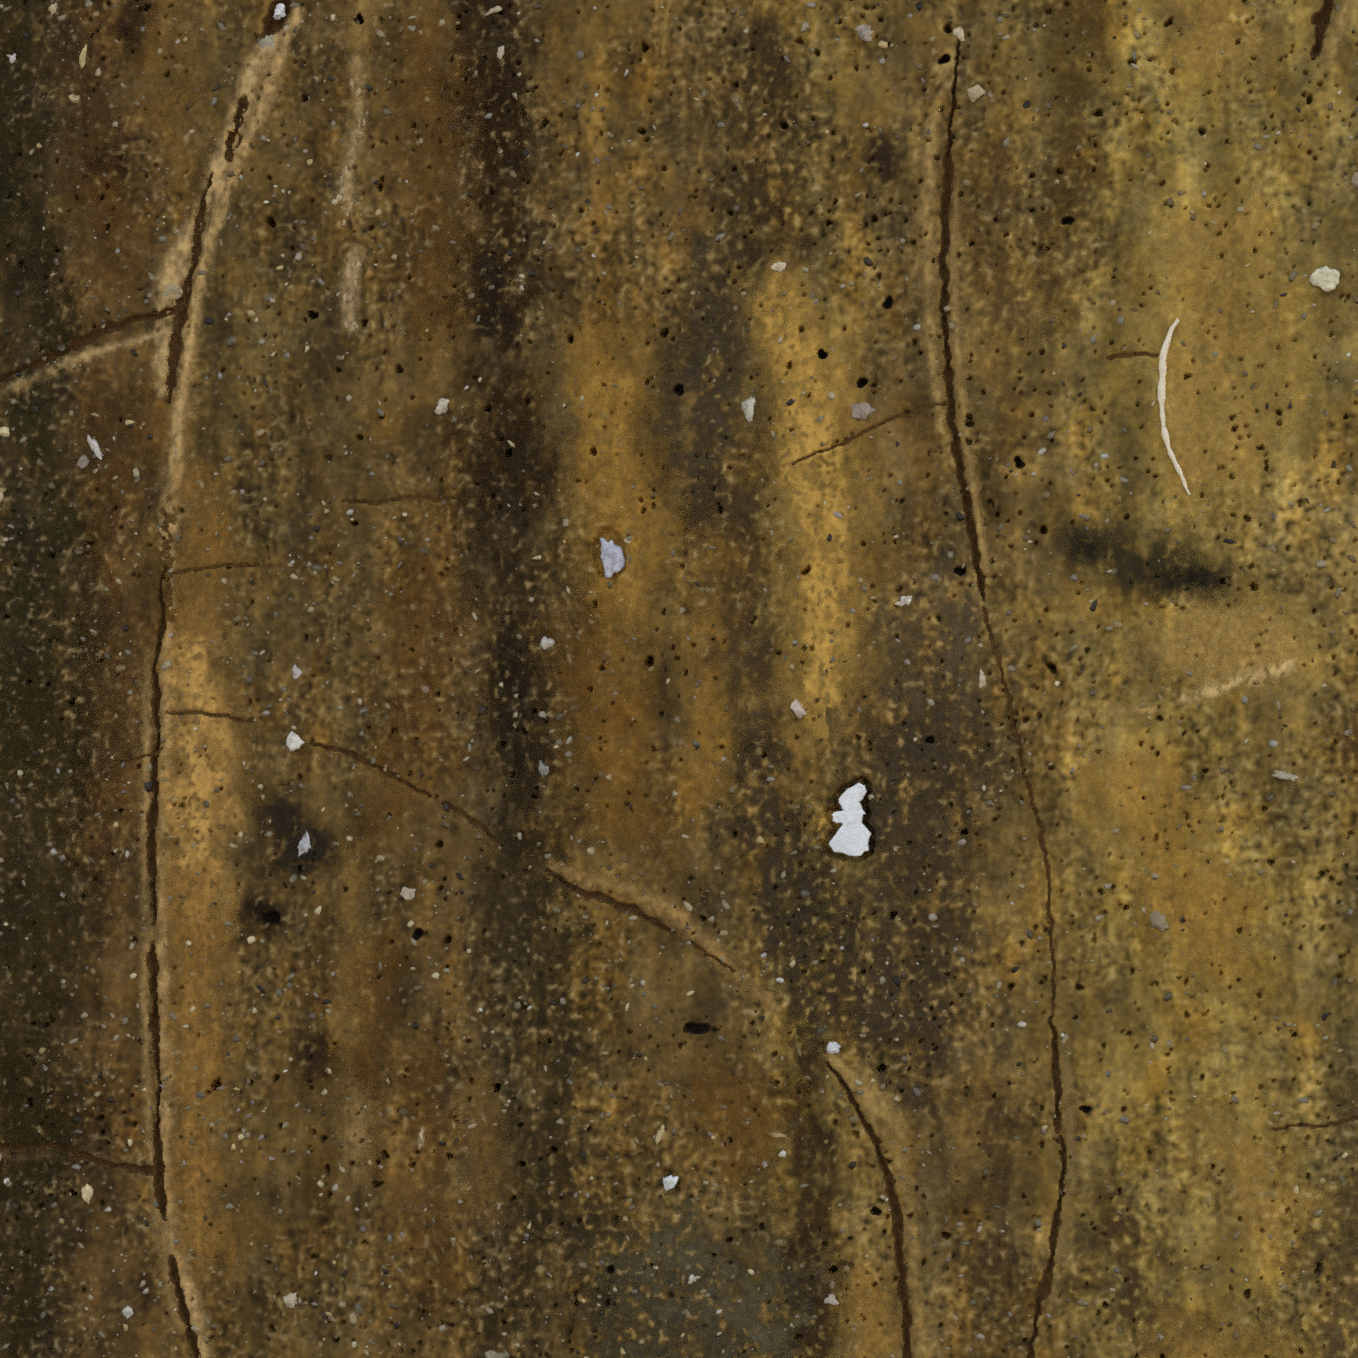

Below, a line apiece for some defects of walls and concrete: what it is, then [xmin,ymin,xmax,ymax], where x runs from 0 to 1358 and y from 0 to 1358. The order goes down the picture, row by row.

crack [1310,0,1349,72]
water stain [1153,209,1273,493]
crack [0,0,300,1358]
spalling [600,537,625,578]
crack [790,39,1075,1358]
water stain [1066,523,1295,702]
crack [310,742,501,847]
crack [546,863,781,1012]
peeling [829,783,872,856]
water stain [1089,760,1245,977]